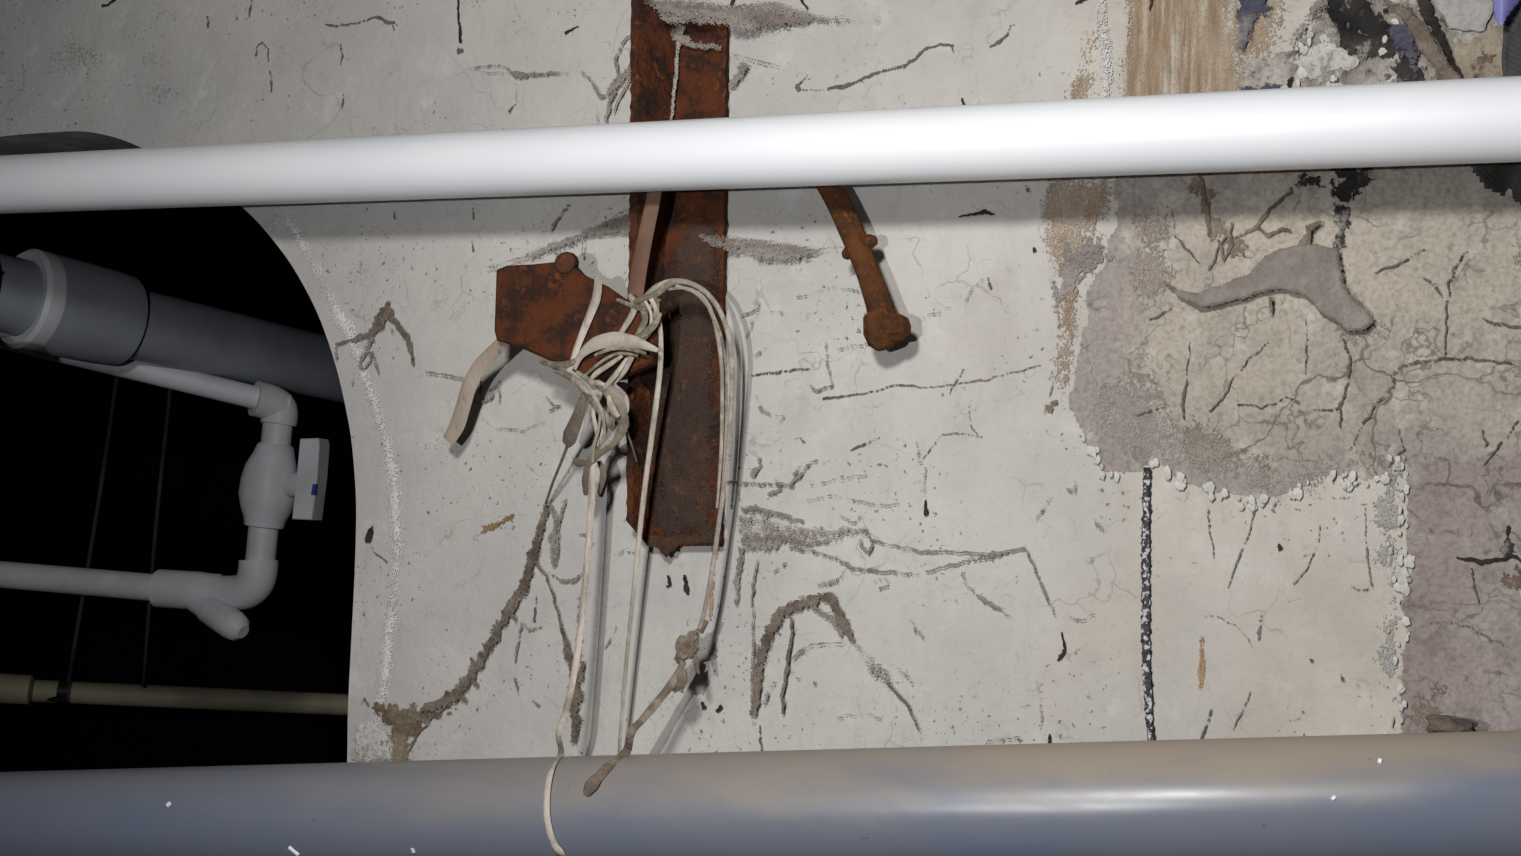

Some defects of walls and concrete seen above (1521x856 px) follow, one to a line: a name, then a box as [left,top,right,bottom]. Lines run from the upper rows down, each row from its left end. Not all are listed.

crack [795,24,1014,91]
leakage [1064,0,1293,100]
spalling [1237,0,1504,91]
leakage [1322,0,1496,82]
crack [1171,210,1200,264]
leakage [1287,167,1375,249]
crack [1135,249,1521,467]
peeling [1068,164,1521,734]
crack [1140,467,1156,740]
crack [1430,554,1521,645]
crack [1200,692,1250,739]